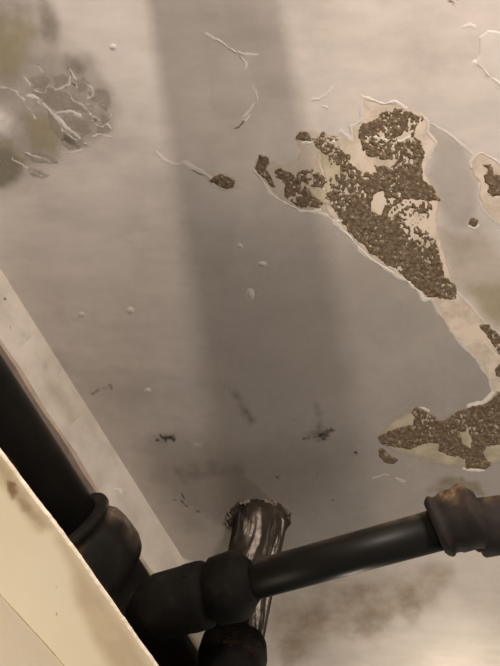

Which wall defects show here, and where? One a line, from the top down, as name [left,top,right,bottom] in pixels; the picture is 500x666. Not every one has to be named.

crack [204,32,258,70]
peeling [471,30,500,89]
crack [234,86,258,129]
peeling [156,151,235,189]
peeling [253,94,500,472]